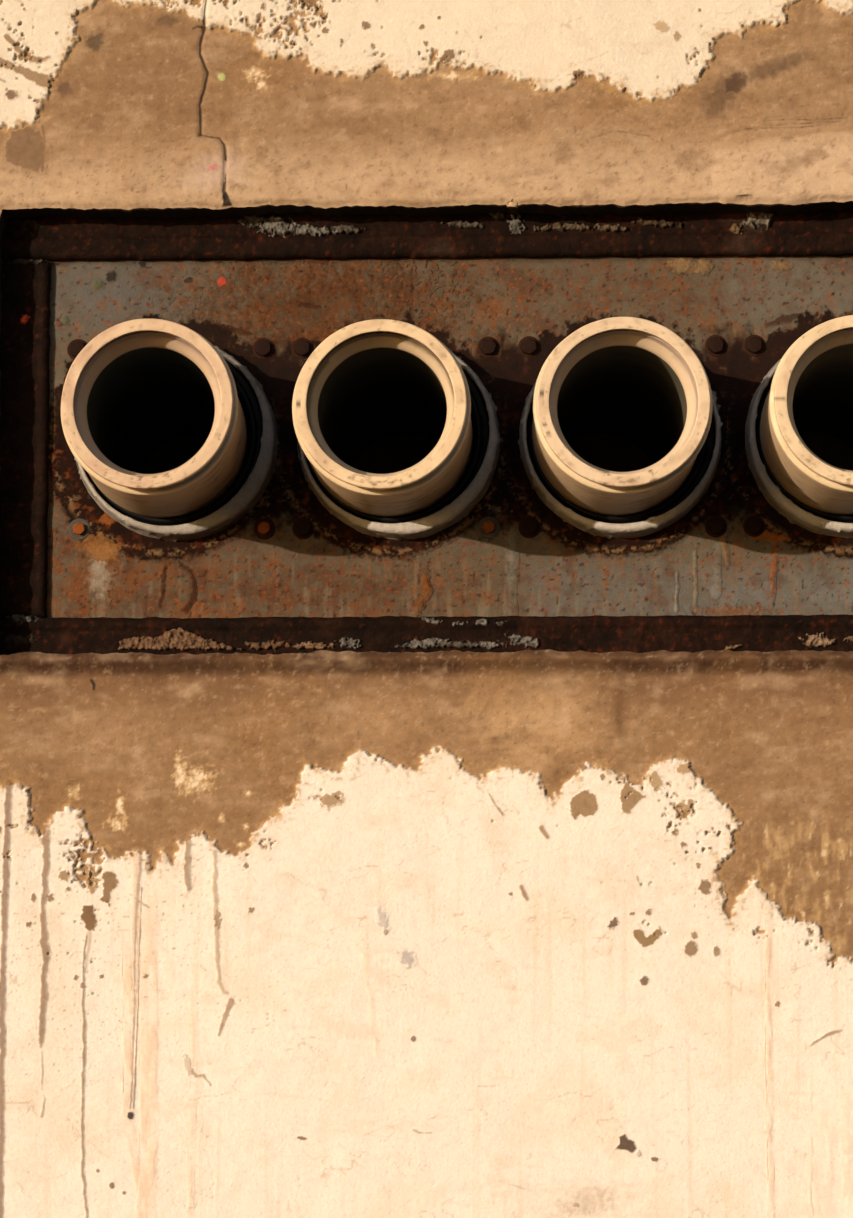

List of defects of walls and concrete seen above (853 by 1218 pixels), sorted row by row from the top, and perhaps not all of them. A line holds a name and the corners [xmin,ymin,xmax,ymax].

damp [4,123,47,172]
damp [82,28,108,56]
crack [190,0,234,208]
damp [694,44,833,132]
rust [48,257,853,617]
damp [0,779,14,1218]
damp [37,827,52,1119]
damp [79,930,93,1218]
damp [127,849,150,1120]
damp [182,834,193,892]
damp [210,847,235,1037]
damp [393,946,419,970]